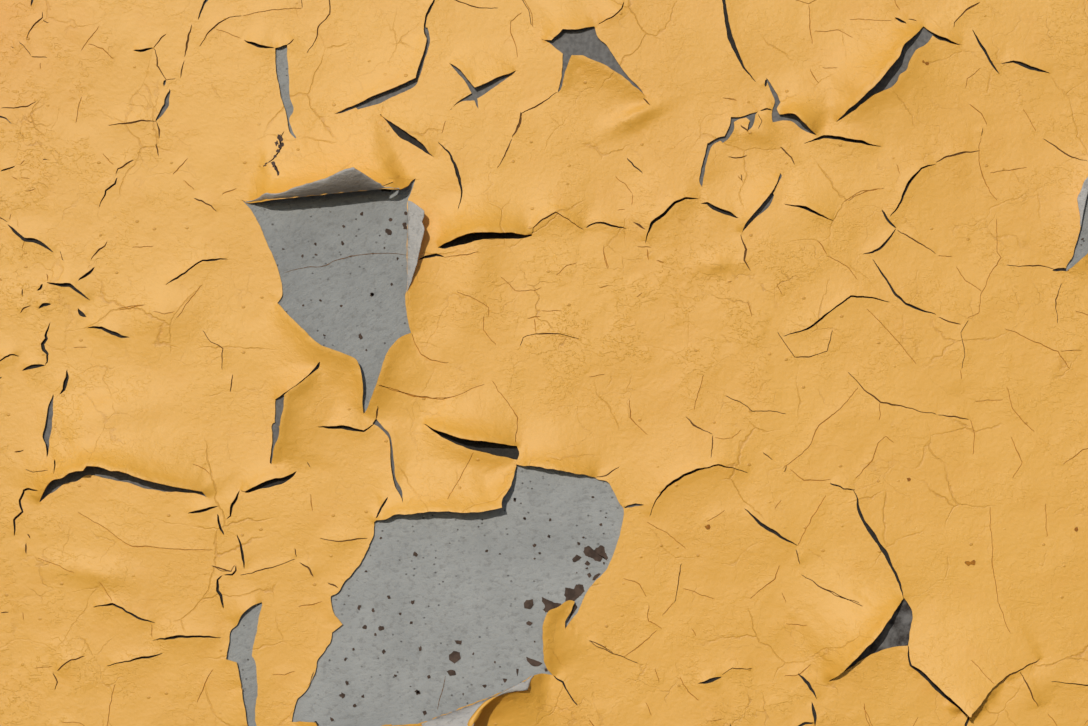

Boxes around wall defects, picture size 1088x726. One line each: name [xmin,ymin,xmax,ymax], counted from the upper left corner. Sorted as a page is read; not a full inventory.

crack [9,450,72,572]
crack [0,213,241,394]
crack [81,0,331,211]
crack [37,464,388,726]
peeling [8,20,624,726]
crack [320,381,518,445]
crack [421,0,535,57]
peeling [449,0,663,132]
crack [458,156,753,345]
crack [588,371,1033,726]
crack [720,0,1087,380]
peeling [1030,106,1088,302]